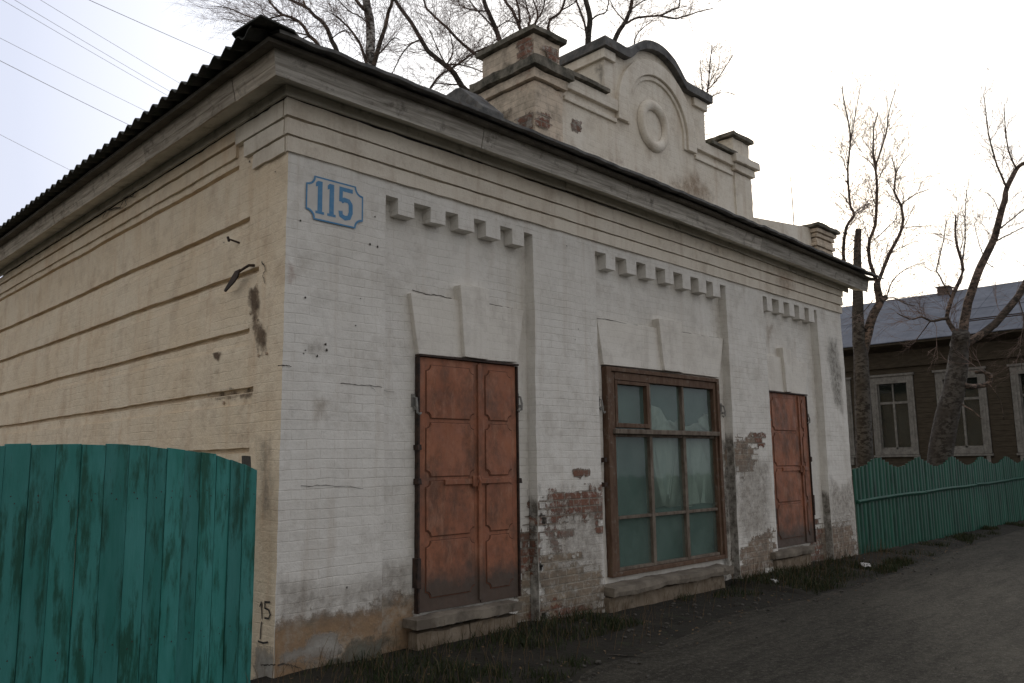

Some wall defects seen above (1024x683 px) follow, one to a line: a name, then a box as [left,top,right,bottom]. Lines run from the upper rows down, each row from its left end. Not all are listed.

spalling [515,37,560,63]
spalling [514,110,552,130]
spalling [571,118,582,134]
spalling [723,432,766,479]
peeling [513,467,605,623]
peeling [730,527,777,579]